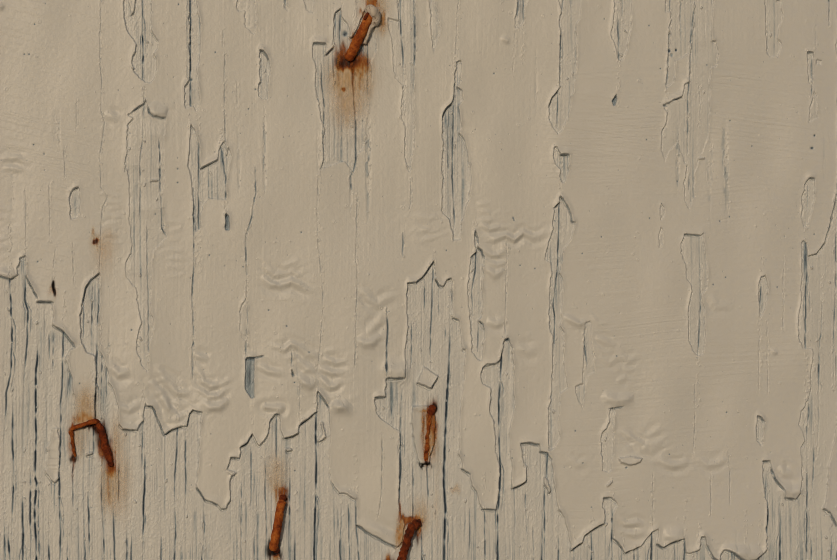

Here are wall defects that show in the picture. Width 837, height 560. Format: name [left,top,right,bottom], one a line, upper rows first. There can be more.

rust [333,37,369,115]
rust [360,0,385,26]
rust [69,397,118,502]
crack [3,0,206,560]
crack [237,362,320,560]
peeling [0,196,740,560]
rust [396,504,424,545]
rust [419,402,437,468]
crack [378,219,479,560]
crack [553,154,561,376]
peeling [757,177,837,560]
crack [766,185,837,560]